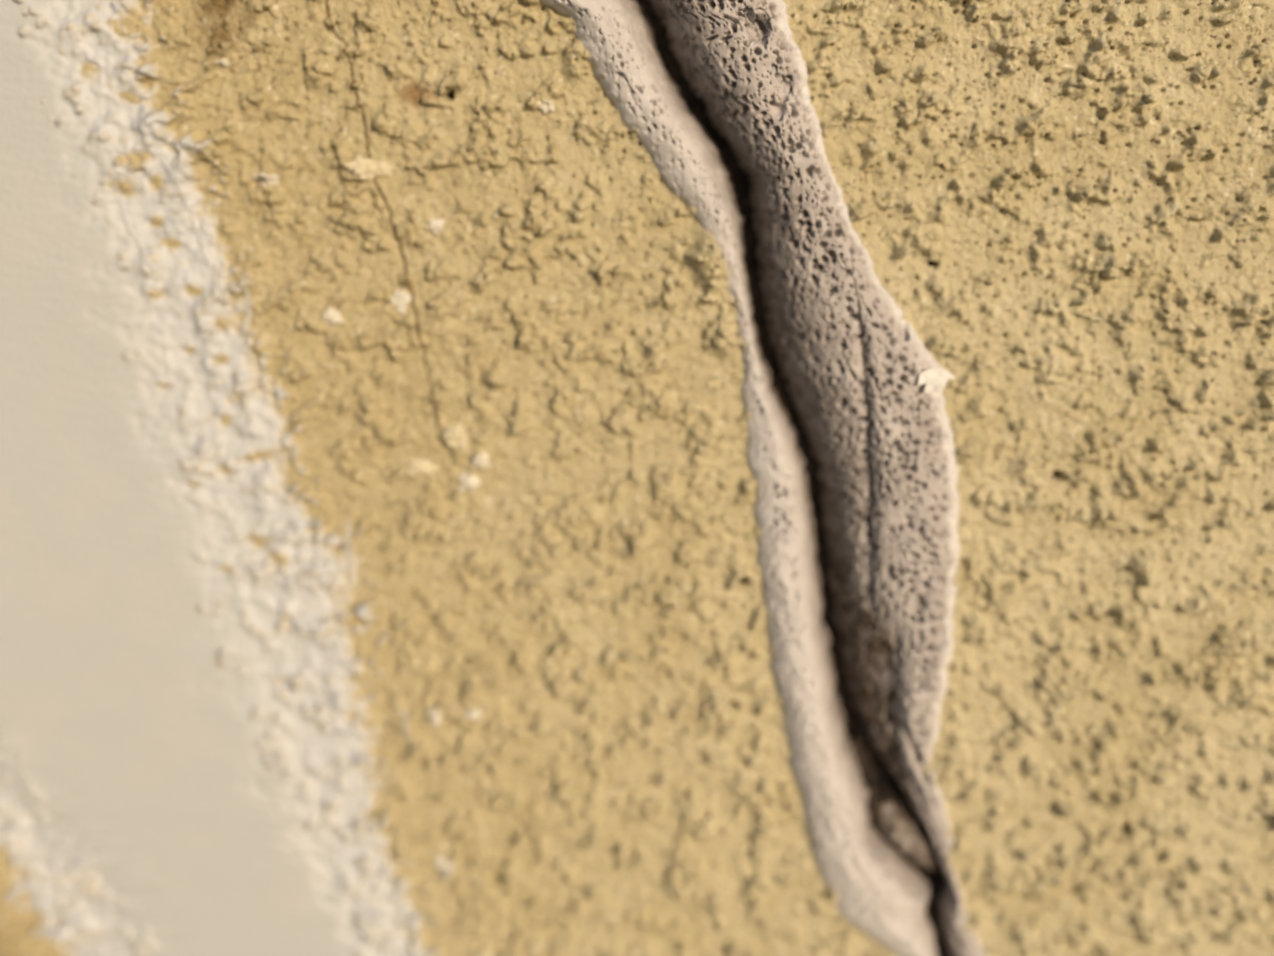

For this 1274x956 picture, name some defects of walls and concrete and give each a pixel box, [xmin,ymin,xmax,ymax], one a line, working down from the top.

crack [637,0,948,956]